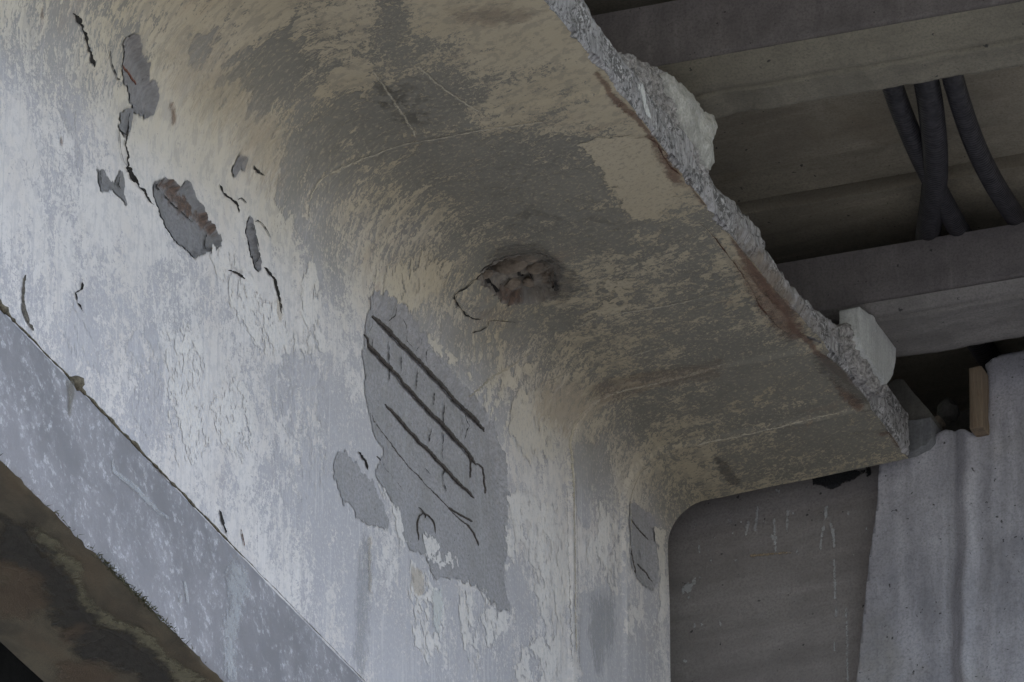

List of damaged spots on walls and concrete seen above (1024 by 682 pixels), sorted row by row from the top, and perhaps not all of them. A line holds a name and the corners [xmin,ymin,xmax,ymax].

crack [73,13,120,80]
spalling [98,169,127,206]
crack [119,114,154,205]
spalling [119,34,160,136]
peeling [577,135,681,221]
rust [595,73,710,212]
spalling [618,52,718,193]
spalling [152,177,326,364]
crack [228,267,282,313]
rust [732,238,864,409]
spalling [831,307,896,397]
spalling [334,249,668,682]